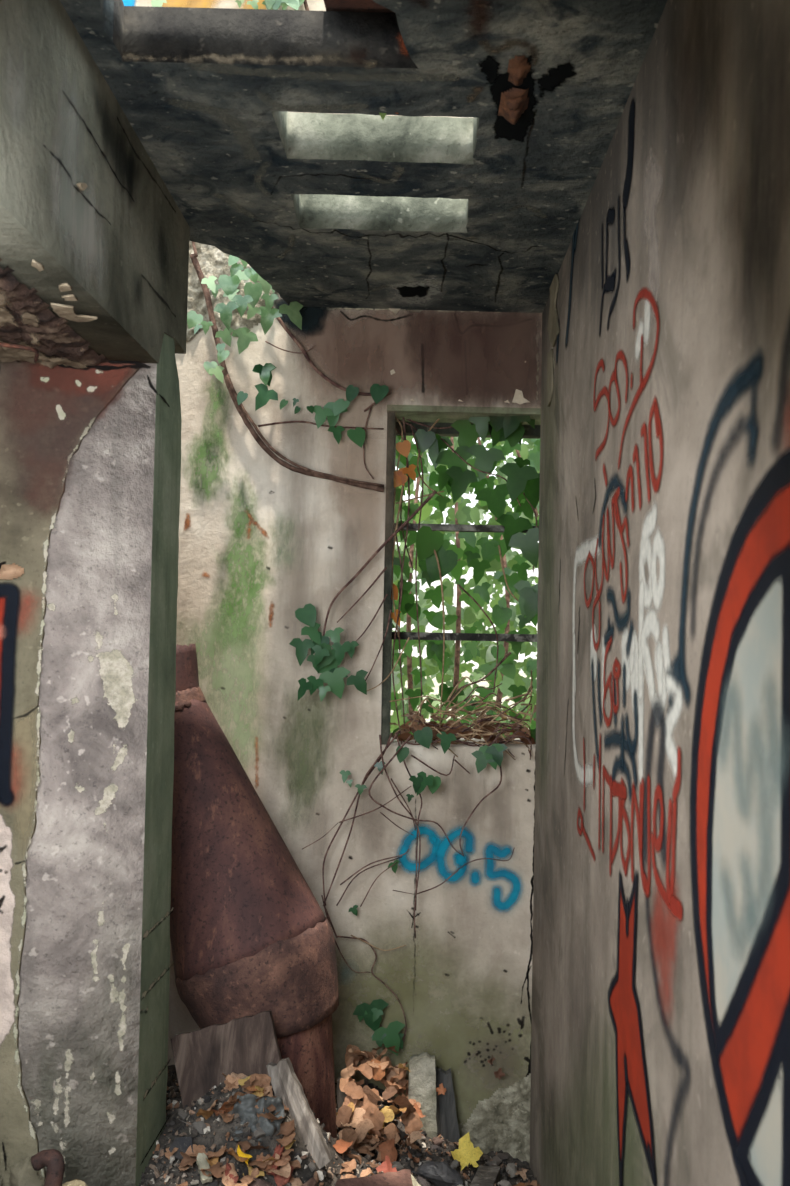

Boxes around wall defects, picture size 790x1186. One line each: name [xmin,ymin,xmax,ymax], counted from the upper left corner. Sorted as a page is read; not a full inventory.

crack [193,65,457,111]
spalling [467,40,577,142]
crack [44,145,111,225]
crack [62,90,176,213]
crack [169,99,539,302]
crack [141,275,176,317]
damp [231,489,255,538]
flaking render [0,258,140,1186]